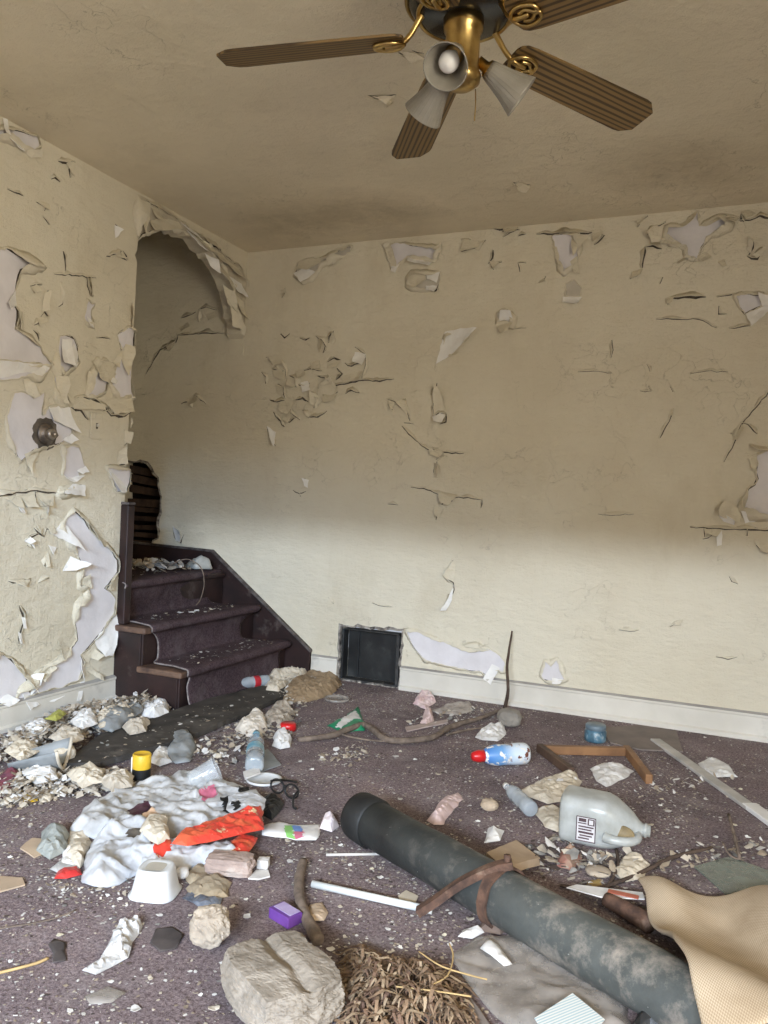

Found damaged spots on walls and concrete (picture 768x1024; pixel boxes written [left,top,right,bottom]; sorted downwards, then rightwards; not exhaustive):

peeling [0,118,43,158]
spalling [132,195,251,338]
peeling [551,232,589,304]
peeling [660,210,740,266]
peeling [732,291,768,326]
crack [262,330,482,520]
crack [723,391,768,462]
peeling [0,246,137,792]
spalling [105,460,162,543]
peeling [719,444,768,525]
crack [0,487,58,645]
peeling [337,624,506,689]